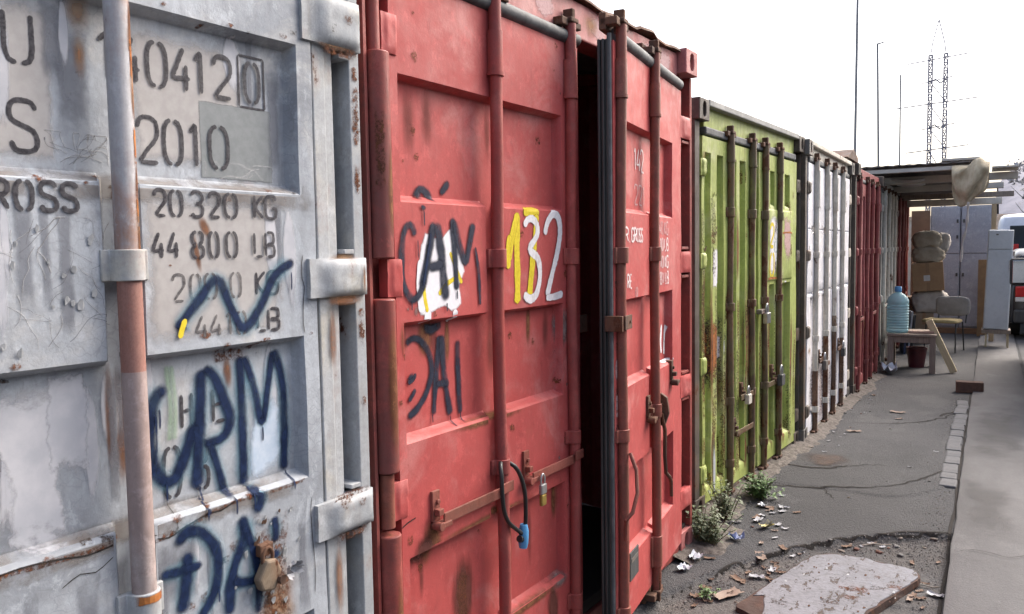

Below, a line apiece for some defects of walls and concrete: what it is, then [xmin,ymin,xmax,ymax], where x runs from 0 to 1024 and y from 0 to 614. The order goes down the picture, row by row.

rust [325,44,359,145]
rust [333,295,365,338]
rust [335,487,367,509]
crack [671,393,1021,614]
rust [455,563,472,614]